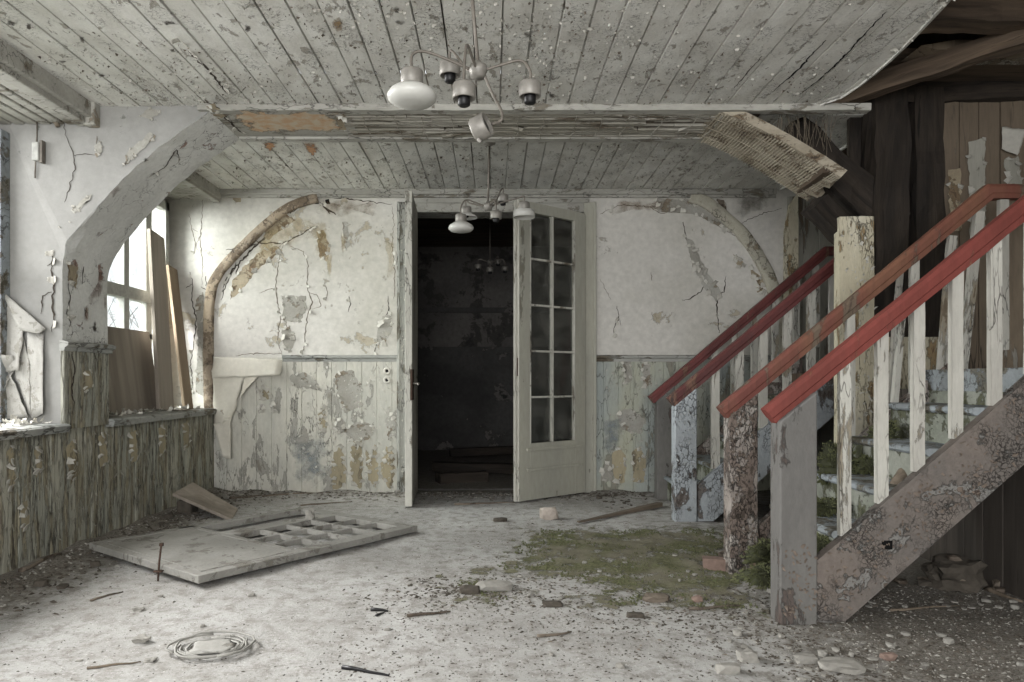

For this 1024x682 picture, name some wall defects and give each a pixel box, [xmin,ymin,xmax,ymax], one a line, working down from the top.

peeling [32,0,955,204]
crack [63,123,98,201]
crack [149,149,180,178]
peeling [946,137,988,213]
peeling [1002,127,1024,184]
peeling [66,251,80,288]
flaking render [229,213,295,298]
peeling [316,230,331,262]
peeling [342,222,352,251]
crack [685,261,726,332]
peeling [281,282,405,489]
peeling [596,362,662,508]